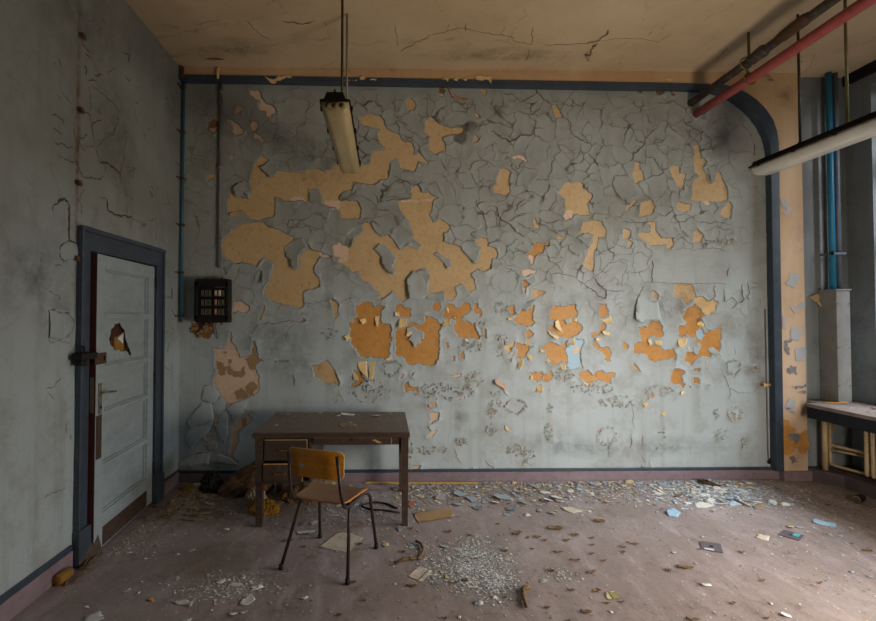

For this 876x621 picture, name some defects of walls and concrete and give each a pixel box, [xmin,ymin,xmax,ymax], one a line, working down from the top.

crack [394,23,667,62]
peeling [439,75,492,106]
crack [52,16,169,266]
peeling [494,168,511,196]
peeling [670,144,732,219]
peeling [221,114,503,392]
peeling [503,182,615,393]
peeling [623,200,673,249]
spalling [190,322,214,339]
flaking render [214,334,261,404]
peeling [622,283,722,395]
peeling [783,419,810,456]